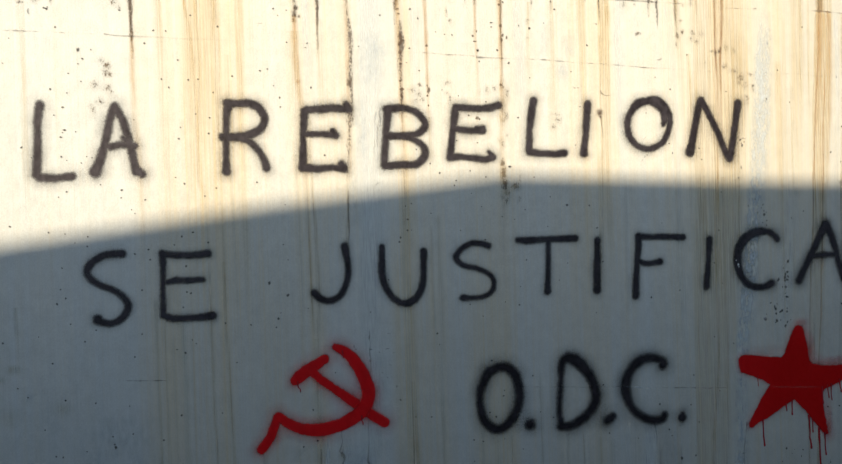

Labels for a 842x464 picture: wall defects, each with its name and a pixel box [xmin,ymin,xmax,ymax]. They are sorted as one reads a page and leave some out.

rust [815,0,831,97]